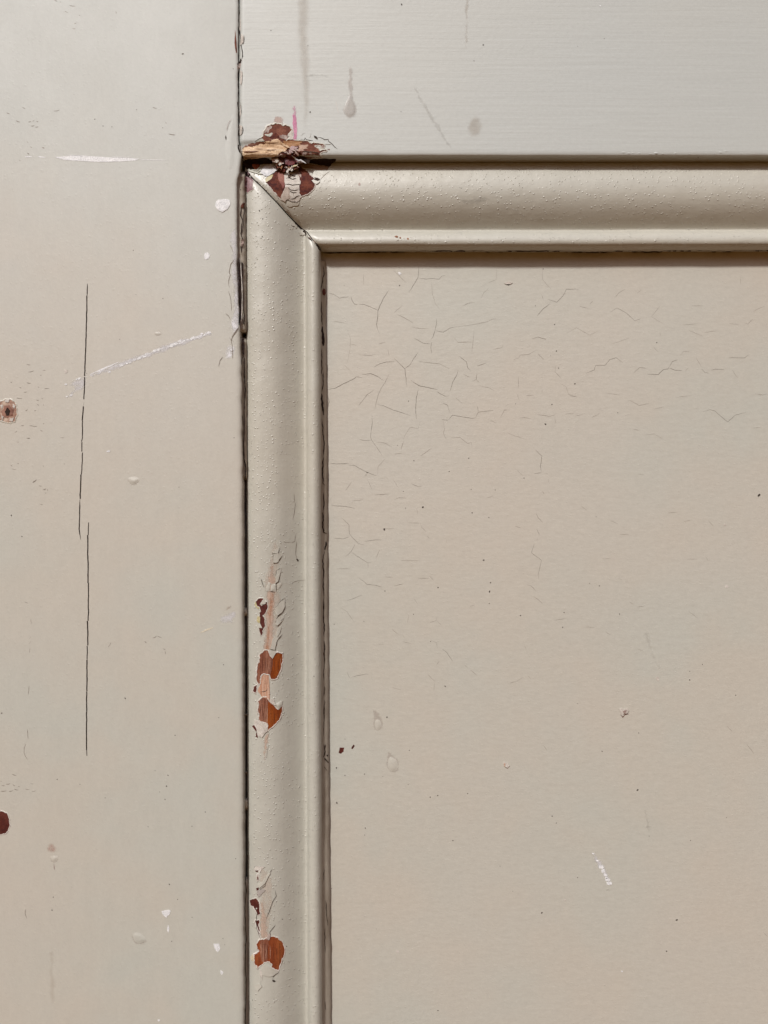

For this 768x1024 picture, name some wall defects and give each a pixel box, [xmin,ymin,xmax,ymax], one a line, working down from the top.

peeling [242,131,336,207]
crack [219,0,701,770]
crack [79,284,89,754]
peeling [252,547,285,751]
peeling [248,866,286,991]